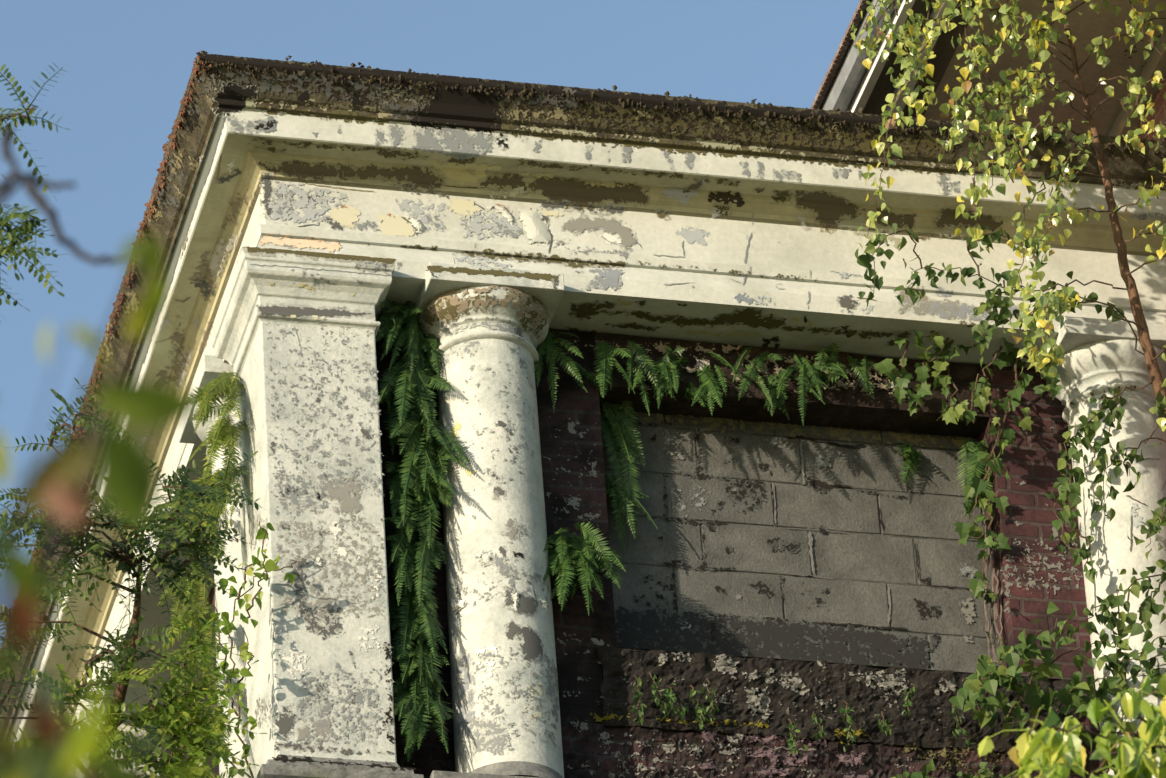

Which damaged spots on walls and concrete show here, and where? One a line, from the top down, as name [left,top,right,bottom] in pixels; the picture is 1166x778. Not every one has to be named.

water stain [128,53,965,380]
peeling [188,159,917,347]
peeling [517,124,659,143]
water stain [418,222,837,500]
peeling [696,138,956,170]
spalling [894,286,1021,324]
water stain [247,303,388,678]
water stain [614,421,941,670]
spalling [476,585,547,677]
water stain [272,642,421,778]
water stain [455,646,560,757]
spalling [743,732,874,778]